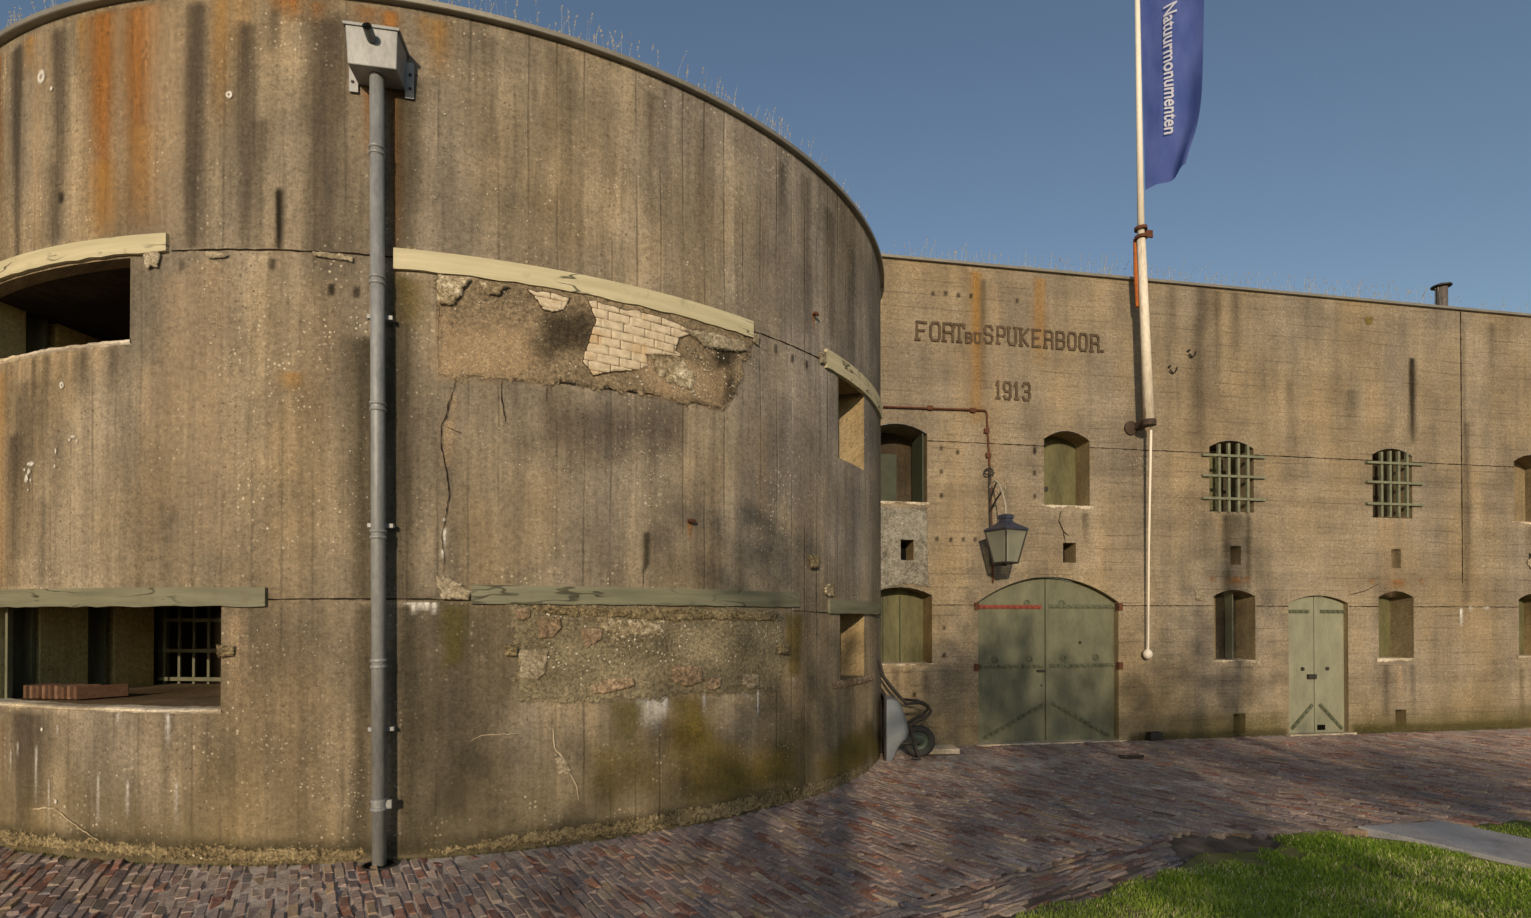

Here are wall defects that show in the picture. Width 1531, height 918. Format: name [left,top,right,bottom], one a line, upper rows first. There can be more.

rust [96,13,113,177]
rust [132,6,152,134]
leakage [188,4,204,183]
spalling [437,274,471,305]
spalling [527,289,570,313]
spalling [582,300,747,394]
crack [437,305,719,572]
spalling [504,644,548,680]
leakage [637,697,667,719]